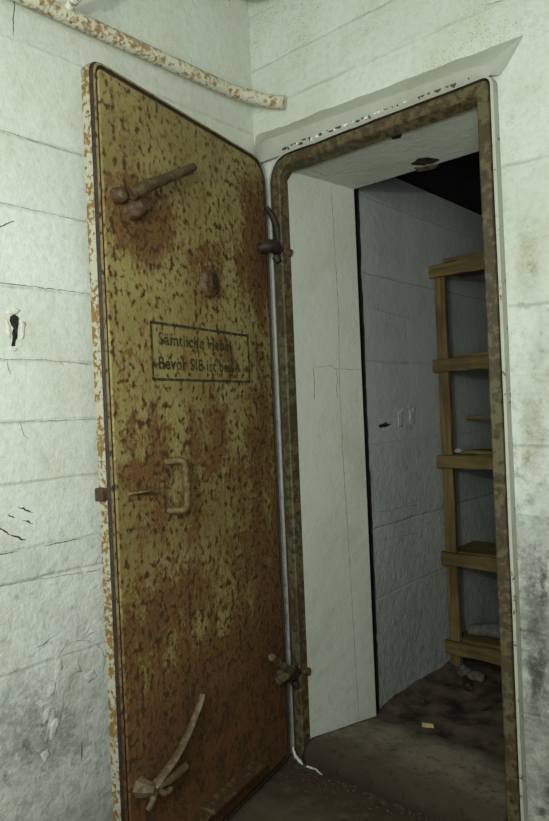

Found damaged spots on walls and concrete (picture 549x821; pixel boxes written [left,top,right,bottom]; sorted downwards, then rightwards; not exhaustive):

spalling [6,306,26,351]